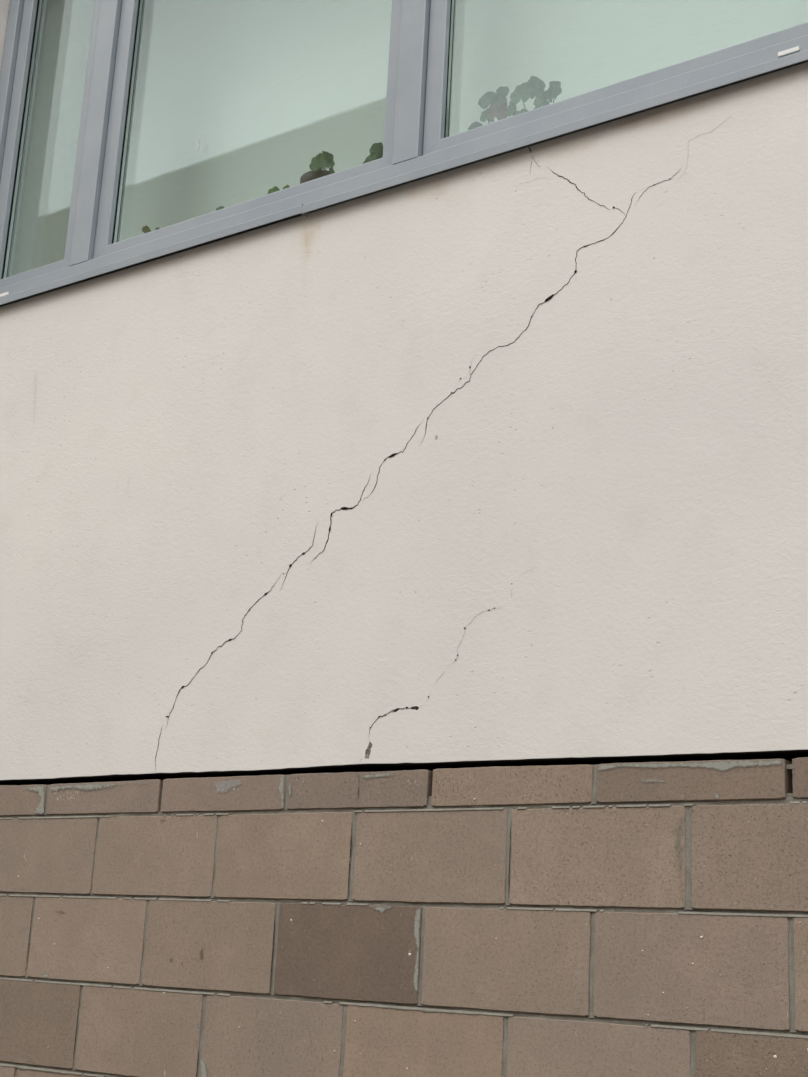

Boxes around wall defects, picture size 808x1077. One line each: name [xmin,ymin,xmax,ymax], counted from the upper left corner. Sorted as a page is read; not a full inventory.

crack [155,121,725,767]